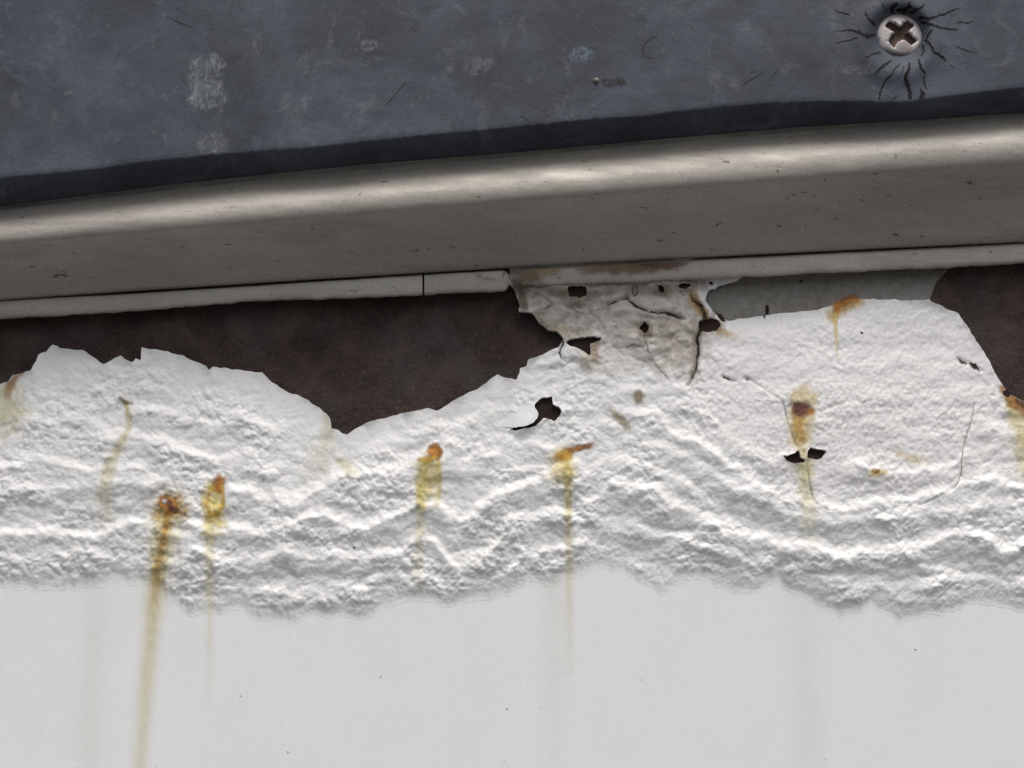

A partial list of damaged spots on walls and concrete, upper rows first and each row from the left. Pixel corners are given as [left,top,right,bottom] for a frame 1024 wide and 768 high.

crack [835,1,974,100]
peeling [0,268,563,434]
crack [523,284,708,381]
rust [833,294,860,332]
peeling [706,263,1024,401]
rust [153,496,180,585]
rust [202,475,225,537]
rust [418,443,442,496]
rust [555,443,592,479]
rust [791,389,815,469]
rust [1000,386,1024,441]